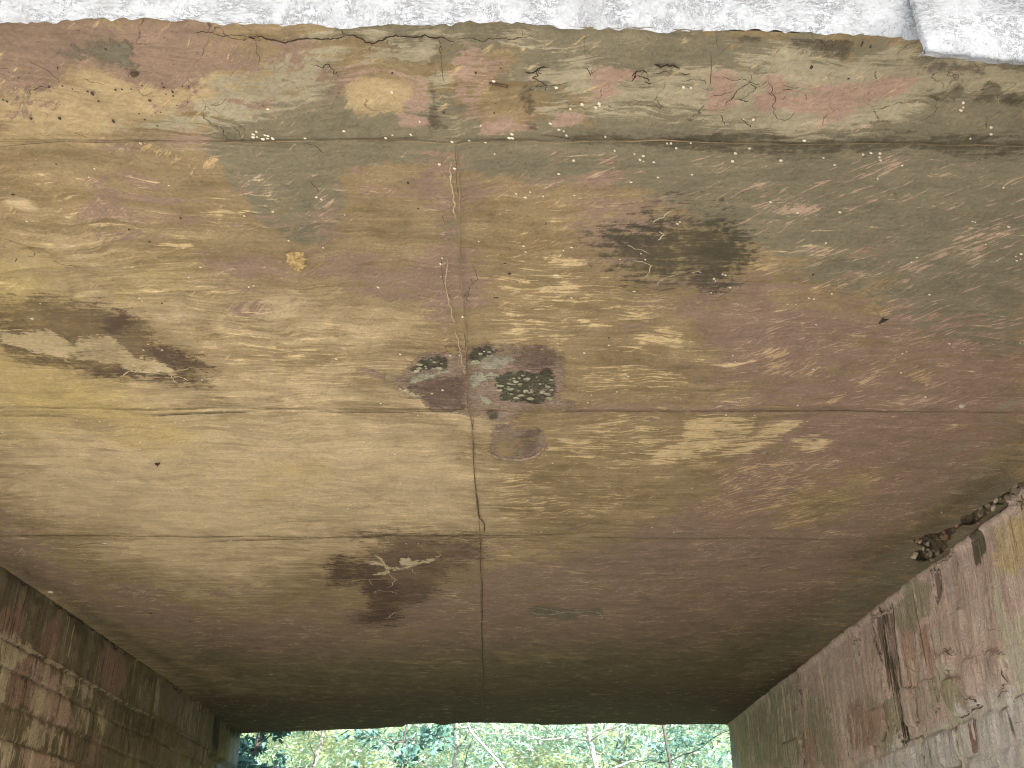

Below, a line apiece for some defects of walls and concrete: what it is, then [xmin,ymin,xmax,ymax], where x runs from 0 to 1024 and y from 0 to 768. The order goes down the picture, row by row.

crack [198,30,530,75]
crack [526,66,565,91]
crack [632,64,807,127]
damp [0,293,214,388]
spalling [911,481,1024,571]
damp [324,527,484,627]